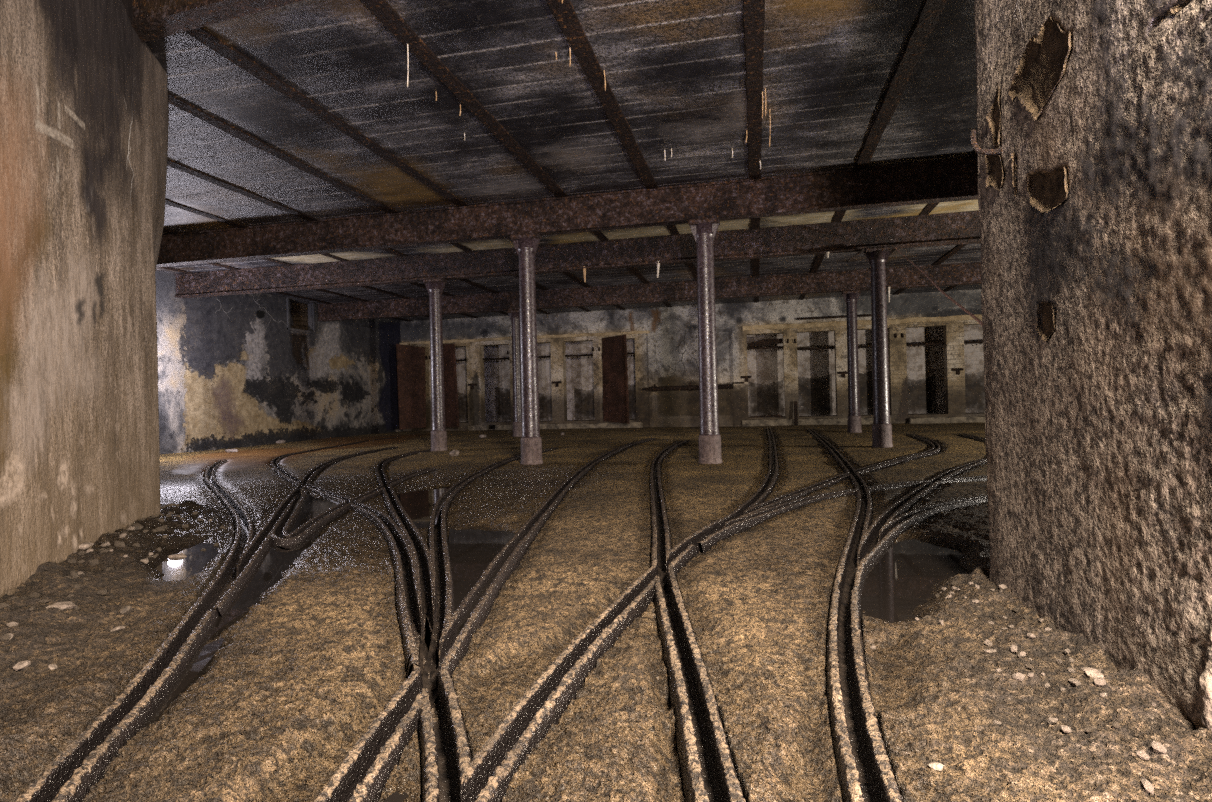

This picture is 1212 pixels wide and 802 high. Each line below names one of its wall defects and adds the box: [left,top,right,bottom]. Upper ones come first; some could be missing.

water stain [47,0,141,235]
spalling [985,15,1072,213]
water stain [78,275,104,321]
spalling [1035,301,1056,341]
peeling [183,341,321,446]